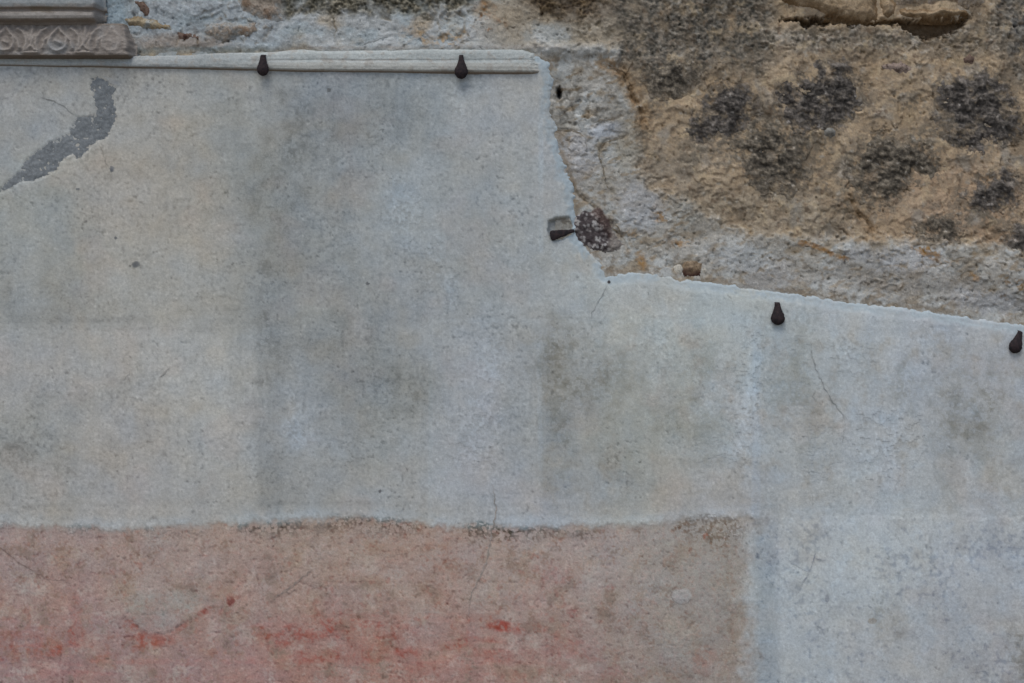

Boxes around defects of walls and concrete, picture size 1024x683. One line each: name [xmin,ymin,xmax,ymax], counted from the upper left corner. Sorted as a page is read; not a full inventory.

spalling [0,75,121,192]
spalling [547,217,573,240]
crack [810,341,849,442]